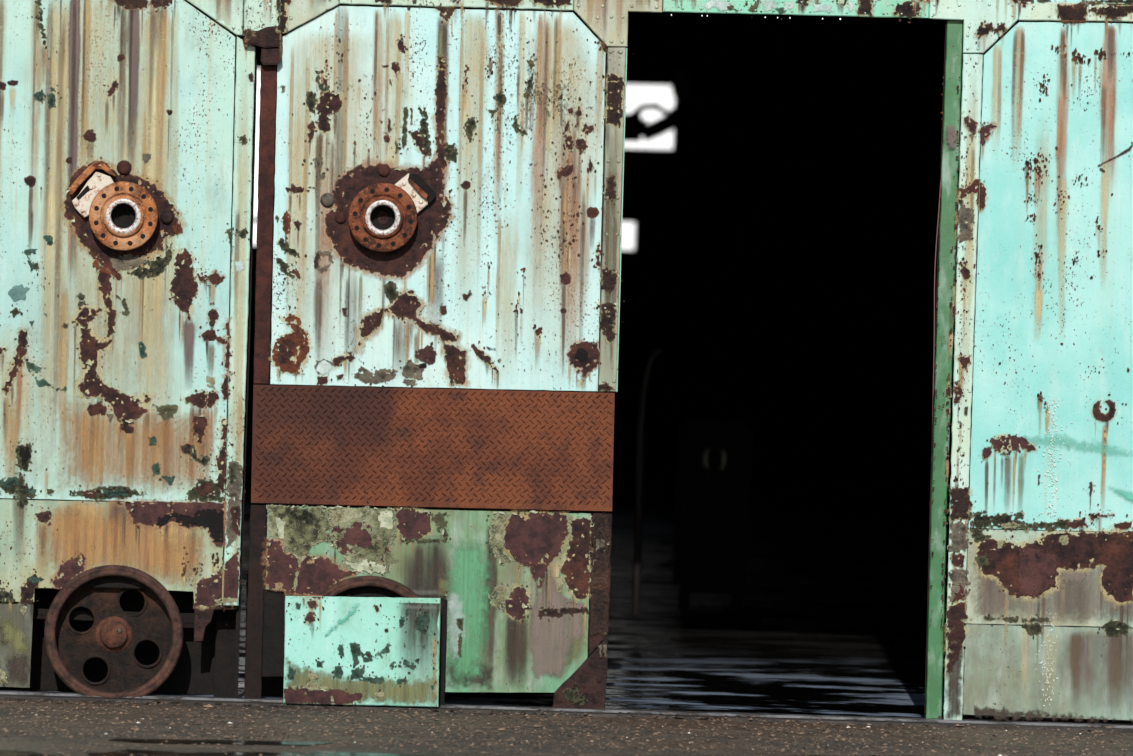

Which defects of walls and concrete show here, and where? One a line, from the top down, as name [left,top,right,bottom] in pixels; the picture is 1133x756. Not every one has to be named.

rust [0,0,244,612]
rust [270,0,627,398]
rust [943,355,972,424]
rust [955,0,1033,286]
rust [1050,0,1133,261]
peeling [264,501,399,575]
rust [485,507,612,675]
rust [940,394,1133,685]